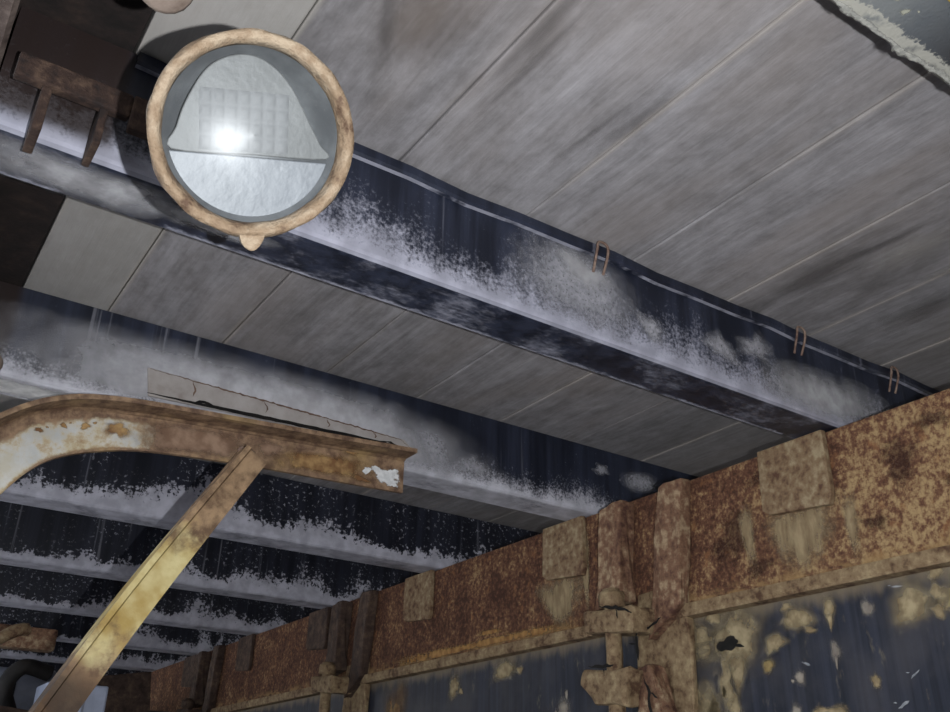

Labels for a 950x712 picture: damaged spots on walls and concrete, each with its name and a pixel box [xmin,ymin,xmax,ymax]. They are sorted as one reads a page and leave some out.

peeling [834,0,950,85]
corrosion [35,422,129,436]
peeling [362,466,400,487]
corrosion [772,508,825,563]
corrosion [405,540,589,664]
corrosion [694,609,758,712]
hole [716,636,744,652]
corrosion [763,603,816,672]
corrosion [824,600,834,629]
corrosion [831,642,840,669]
corrosion [862,602,873,614]
corrosion [895,568,950,623]